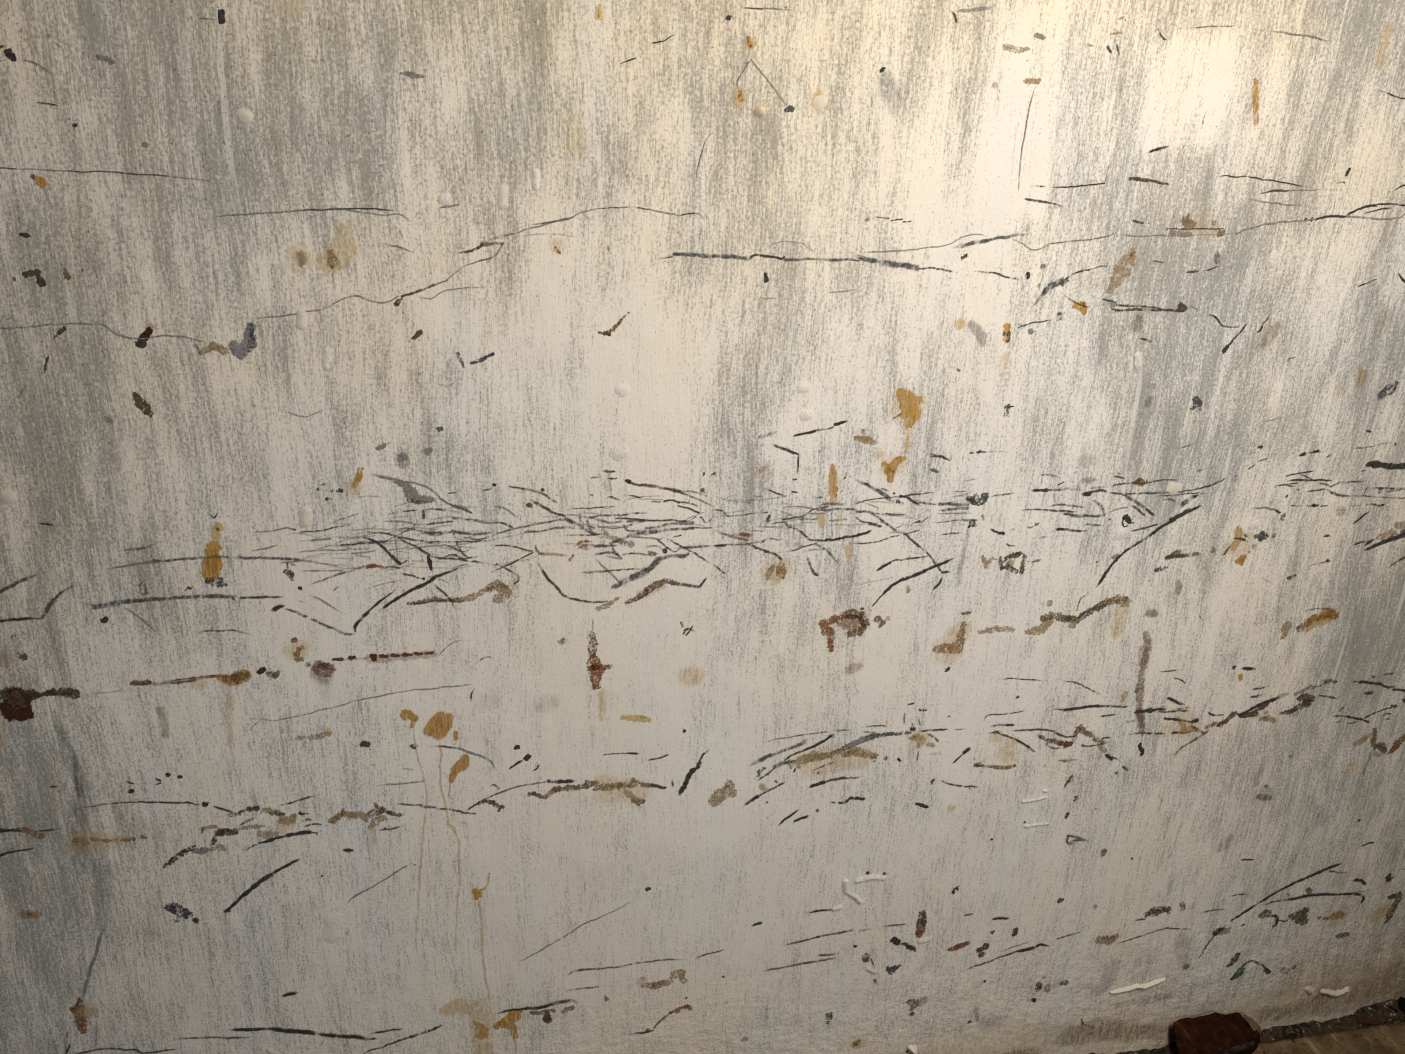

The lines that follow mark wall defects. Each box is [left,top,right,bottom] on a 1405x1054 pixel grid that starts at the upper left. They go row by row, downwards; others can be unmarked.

crack [247,92,1405,353]
rust [882,388,925,483]
rust [185,513,228,591]
rust [0,686,80,722]
rust [400,709,469,792]
rust [587,620,613,715]
rust [818,608,890,652]
crack [1130,669,1224,756]
crack [746,776,866,824]
crack [224,811,353,913]
crack [952,819,1396,969]
crack [66,992,442,1054]